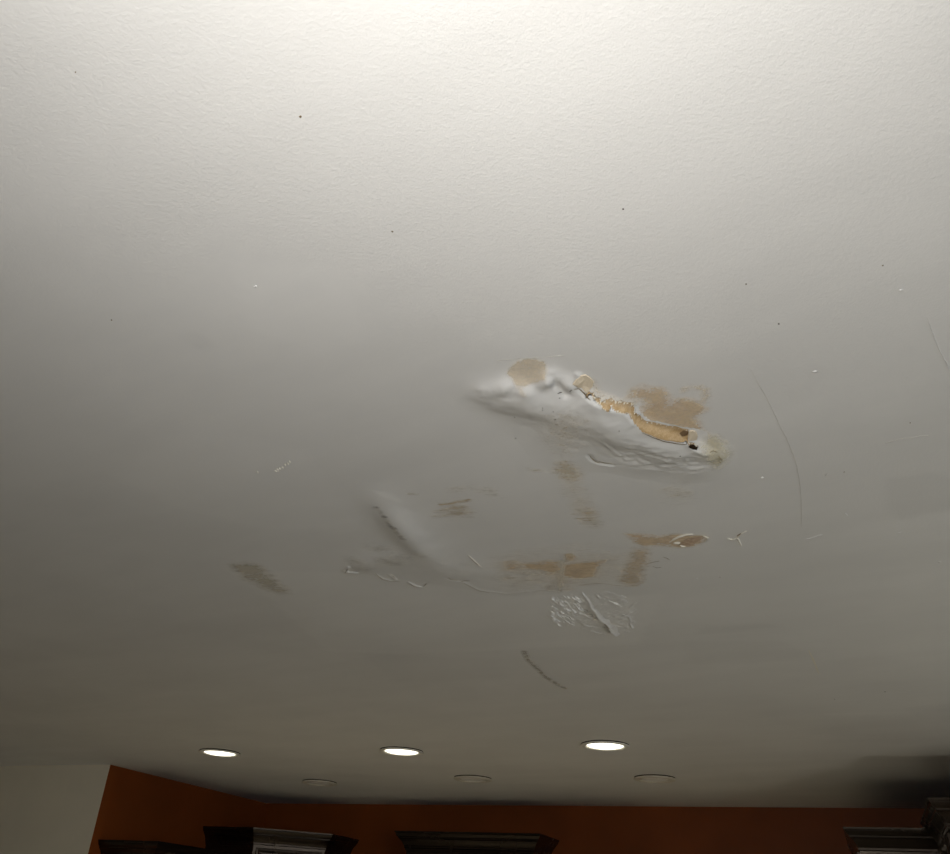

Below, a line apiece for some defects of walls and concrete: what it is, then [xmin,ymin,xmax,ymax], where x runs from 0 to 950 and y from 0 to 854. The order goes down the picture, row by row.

flaking render [546,591,638,637]